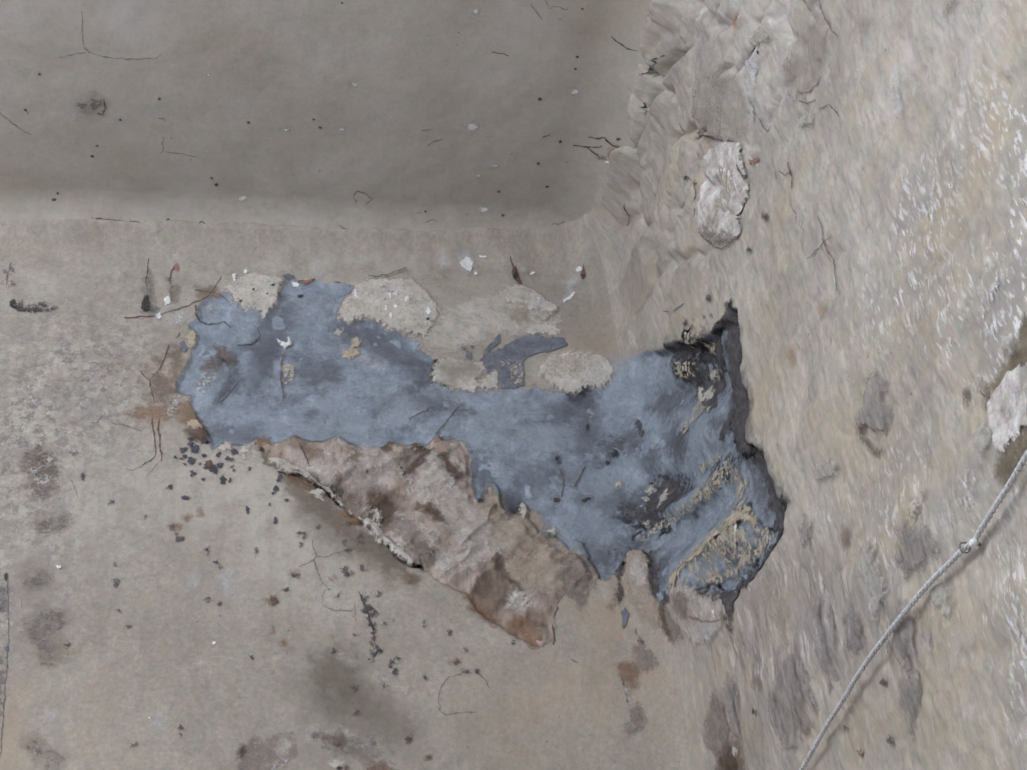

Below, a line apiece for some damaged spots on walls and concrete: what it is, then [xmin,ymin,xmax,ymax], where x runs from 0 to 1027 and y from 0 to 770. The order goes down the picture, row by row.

flaking render [173,273,788,647]